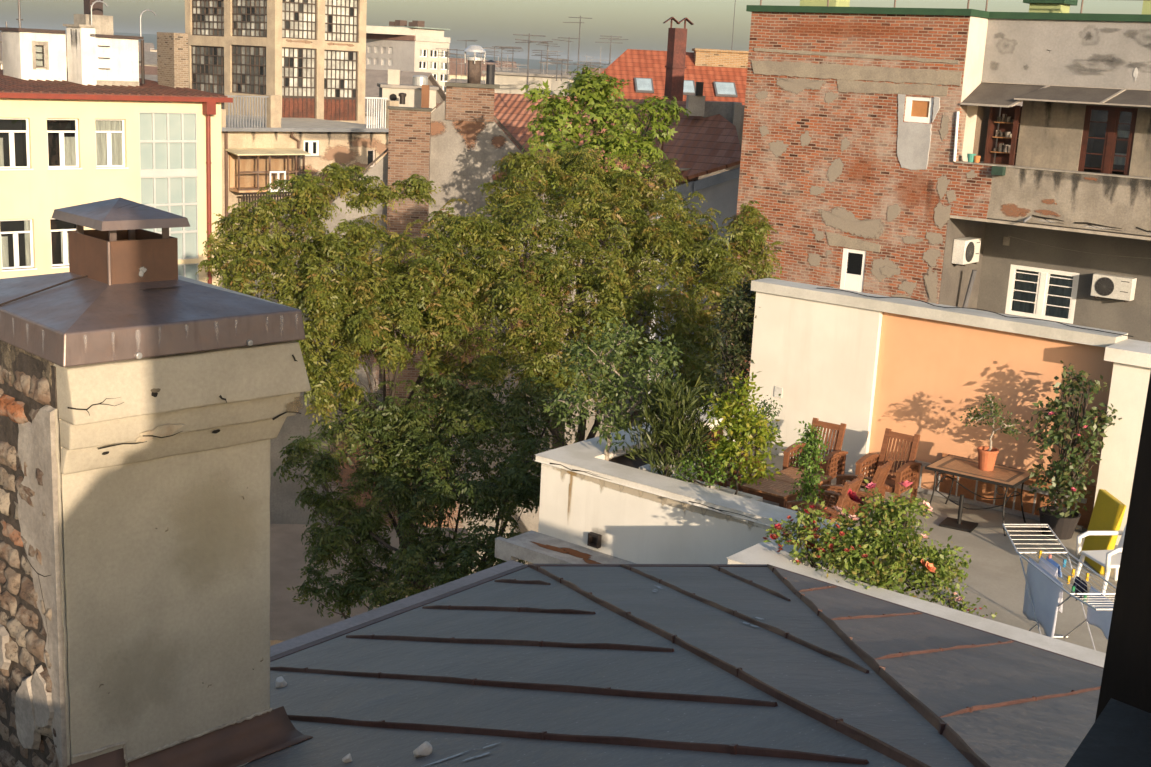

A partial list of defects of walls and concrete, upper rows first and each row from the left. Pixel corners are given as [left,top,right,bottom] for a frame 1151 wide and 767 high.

peeling [932,97,950,141]
peeling [759,126,812,158]
peeling [808,137,902,266]
damp [1020,169,1080,192]
damp [1103,176,1151,199]
peeling [870,175,956,304]
crack [68,397,124,416]
rust [567,470,577,510]
peeling [0,366,67,767]
rust [531,541,601,564]